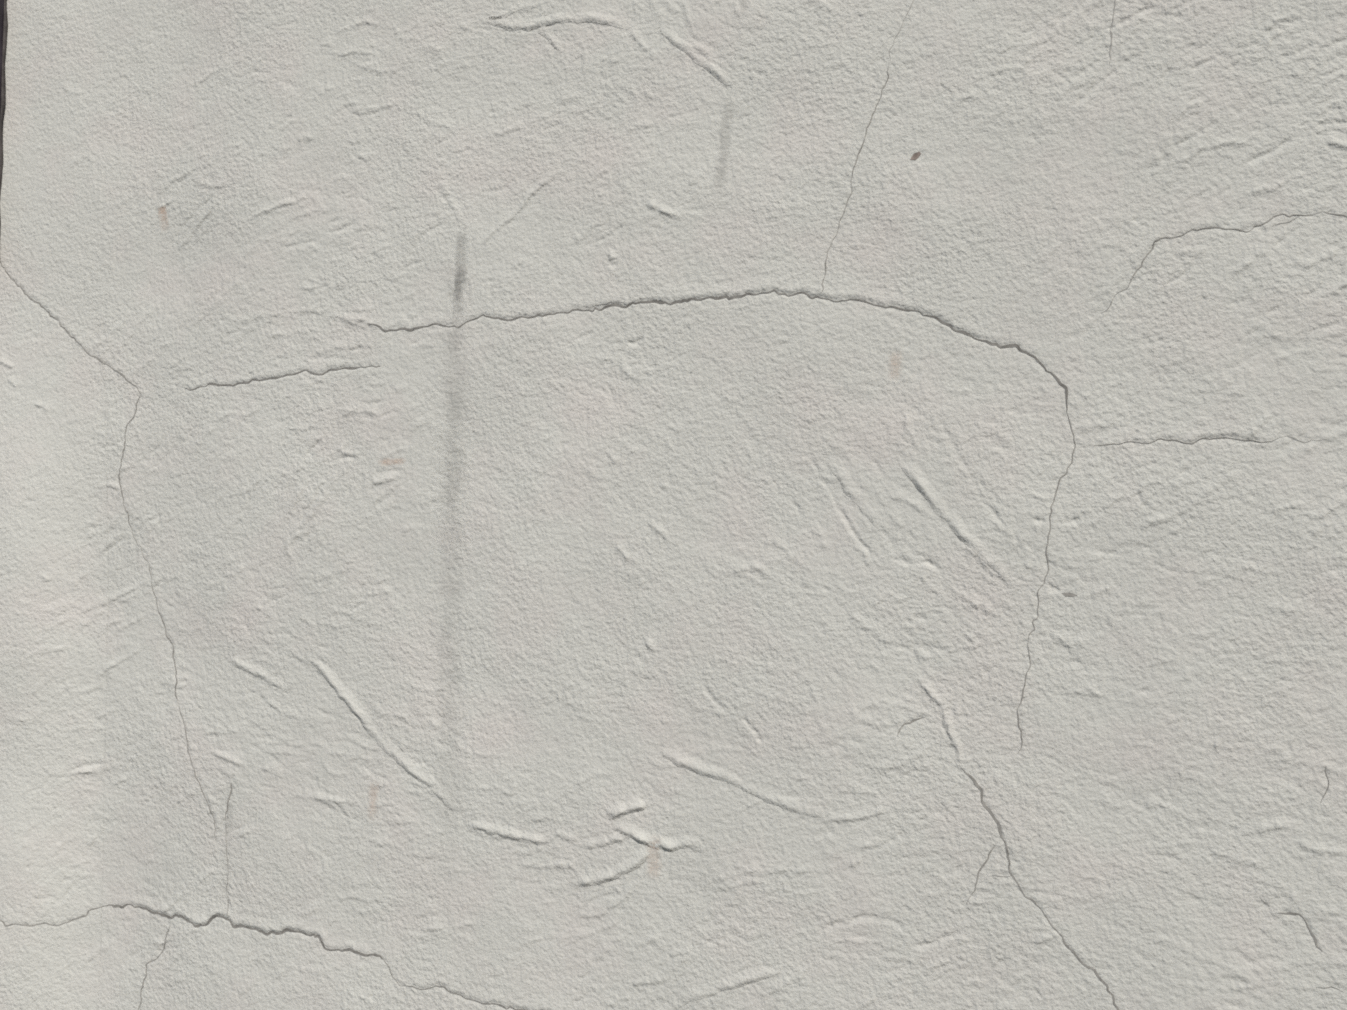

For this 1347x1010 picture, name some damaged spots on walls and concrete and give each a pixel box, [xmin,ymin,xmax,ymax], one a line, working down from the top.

crack [0,261,525,1010]
crack [368,0,1347,753]
crack [963,769,1119,1010]
crack [1264,901,1323,952]